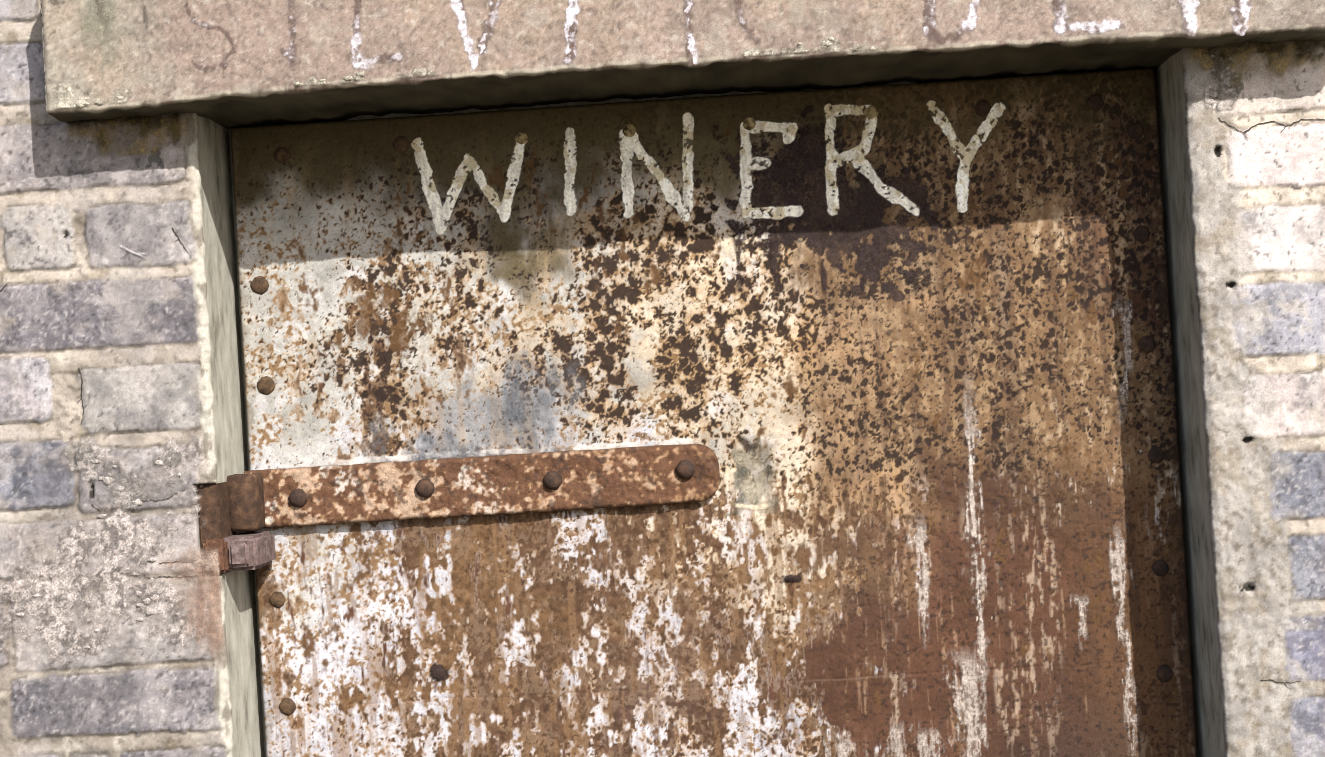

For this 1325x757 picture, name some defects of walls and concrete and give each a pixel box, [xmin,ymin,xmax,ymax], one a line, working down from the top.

rust [710,105,944,301]
crack [1218,117,1325,141]